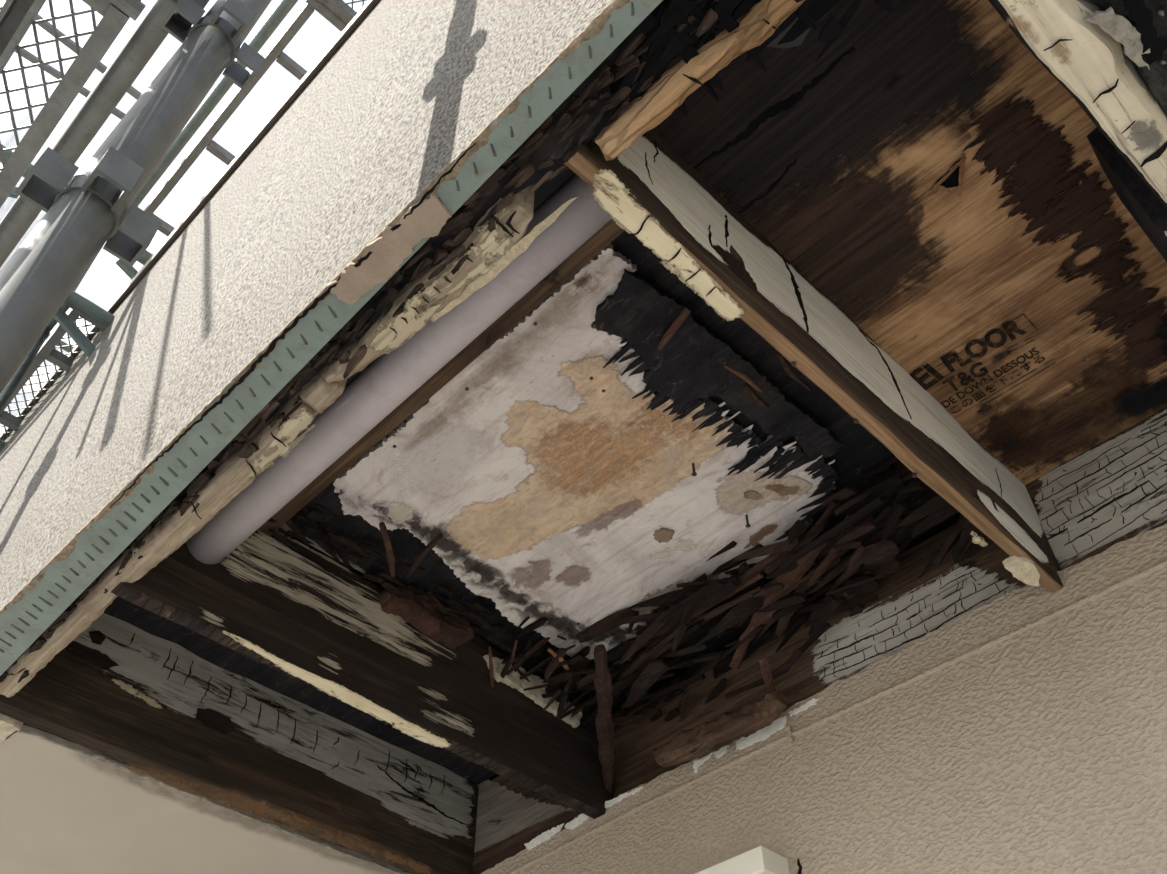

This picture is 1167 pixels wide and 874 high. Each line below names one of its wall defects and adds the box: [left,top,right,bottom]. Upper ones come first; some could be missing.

crack [1141,141,1167,167]
crack [669,159,797,297]
crack [780,255,809,333]
peeling [593,136,1167,568]
damp [977,350,1167,472]
peeling [220,524,457,666]
damp [373,351,743,645]
damp [744,525,778,548]
damp [716,470,812,514]
peeling [811,564,1022,685]
crack [1039,418,1167,565]
peeling [65,606,589,856]